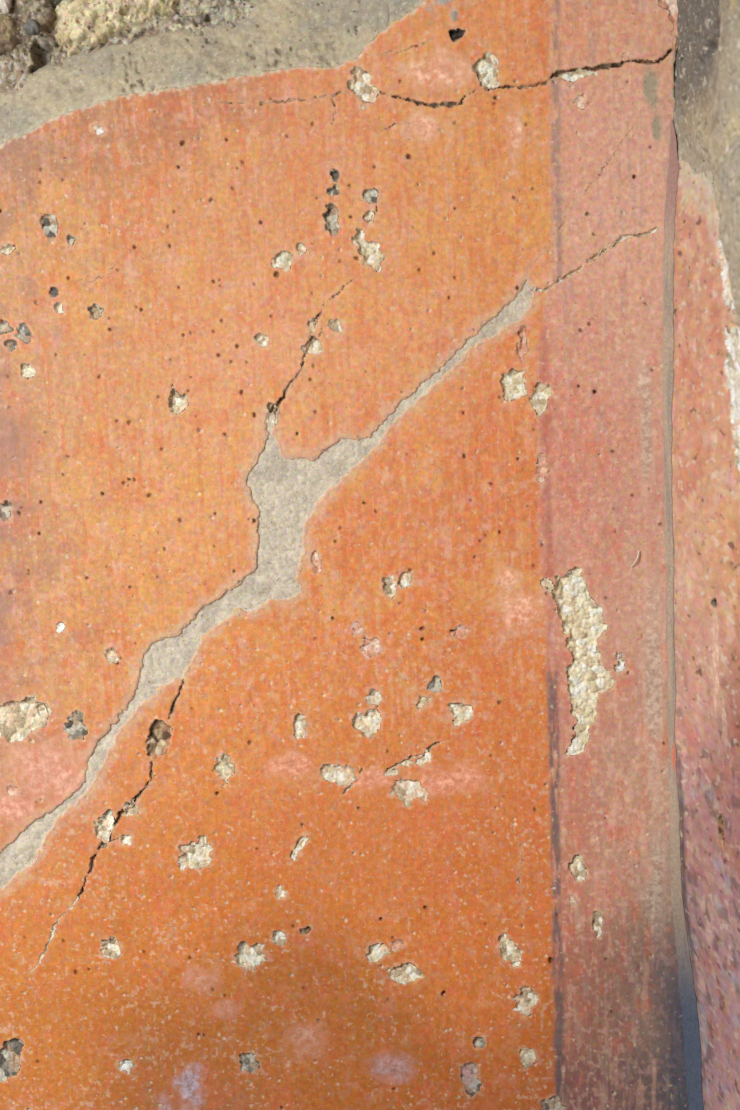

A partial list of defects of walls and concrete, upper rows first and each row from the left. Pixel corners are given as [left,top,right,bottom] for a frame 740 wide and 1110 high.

crack [218,37,675,137]
crack [269,280,353,414]
flaking render [717,234,740,484]
flaking render [541,567,626,755]
flaking render [0,695,52,743]
flaking render [145,719,172,759]
crack [167,678,185,722]
crack [342,742,440,795]
crack [31,761,154,972]
flaking render [178,836,213,871]
crack [290,834,309,861]
flaking render [366,940,423,985]